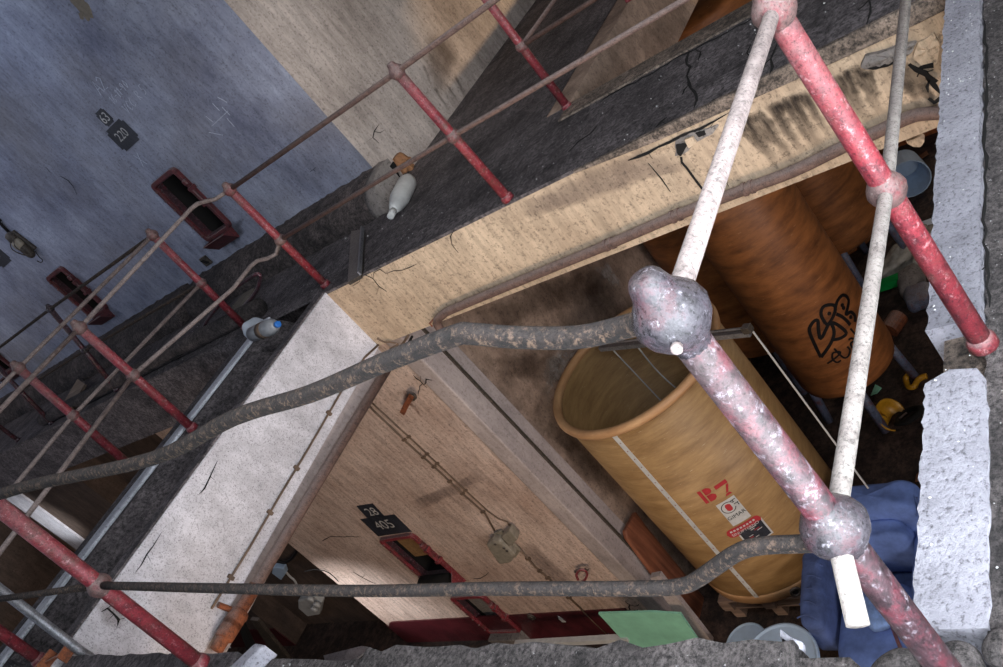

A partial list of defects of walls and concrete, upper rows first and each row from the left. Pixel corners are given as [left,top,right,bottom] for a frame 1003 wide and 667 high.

peeling [70,0,93,22]
crack [858,0,872,25]
crack [600,19,777,191]